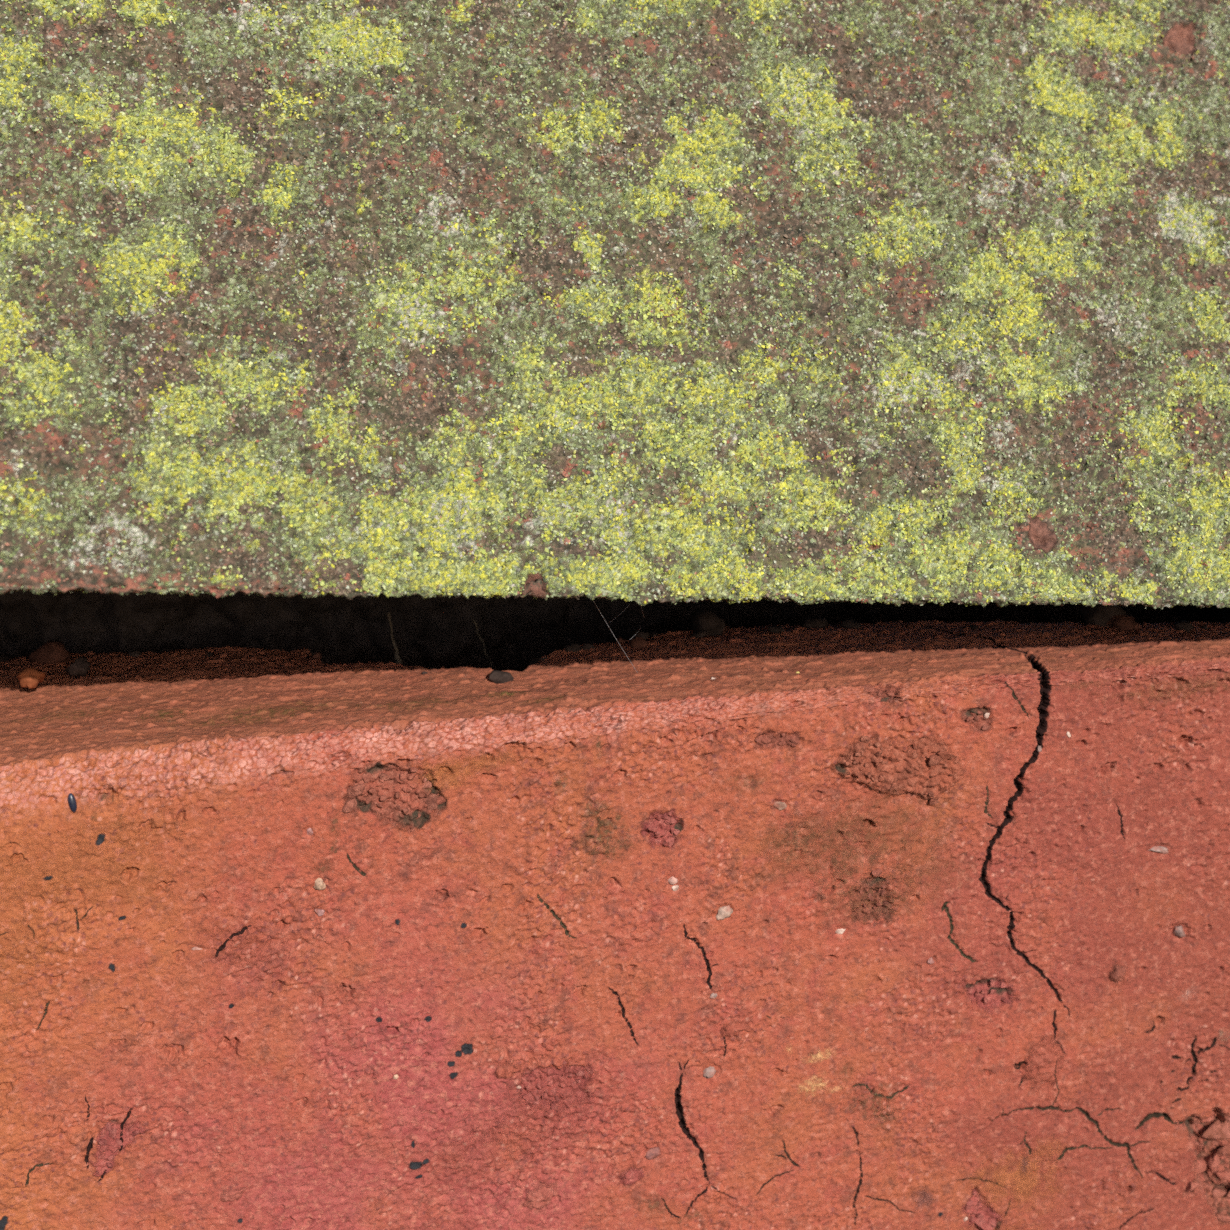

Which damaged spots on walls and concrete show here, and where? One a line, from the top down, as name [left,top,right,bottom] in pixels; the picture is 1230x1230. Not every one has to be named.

spalling [342,762,447,832]
crack [922,626,1230,1185]
crack [683,925,718,989]
crack [662,1060,799,1218]
crack [960,1177,1011,1215]
crack [1119,1208,1154,1230]
spalling [1174,1104,1230,1225]